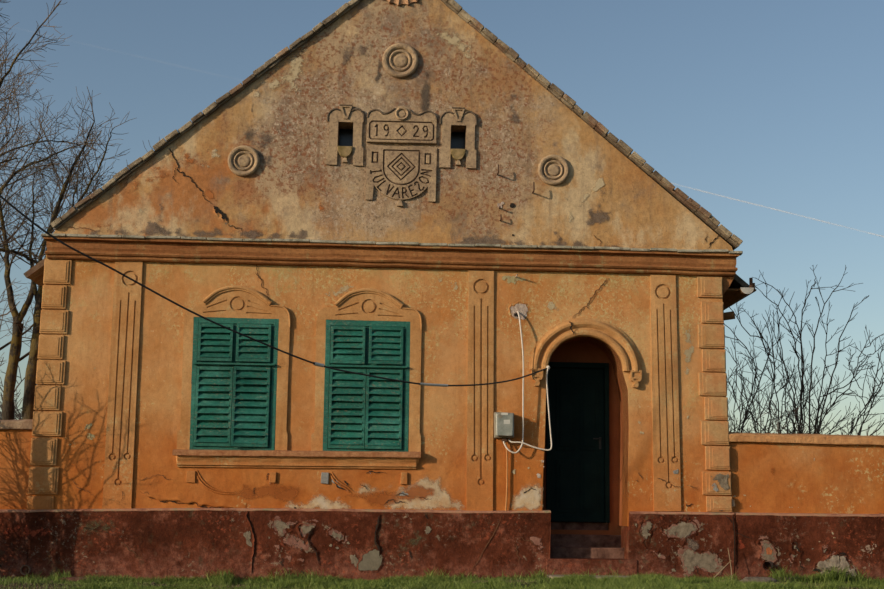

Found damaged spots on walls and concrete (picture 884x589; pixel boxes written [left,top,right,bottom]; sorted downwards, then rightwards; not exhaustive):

crack [170,150,243,234]
crack [569,278,610,334]
peeling [386,478,465,509]
peeling [510,460,544,510]
crack [245,474,268,574]
crack [280,526,321,574]
spalling [268,496,350,562]
spalling [350,547,384,573]
crack [374,514,382,558]
spalling [635,517,724,579]
spalling [739,532,861,578]